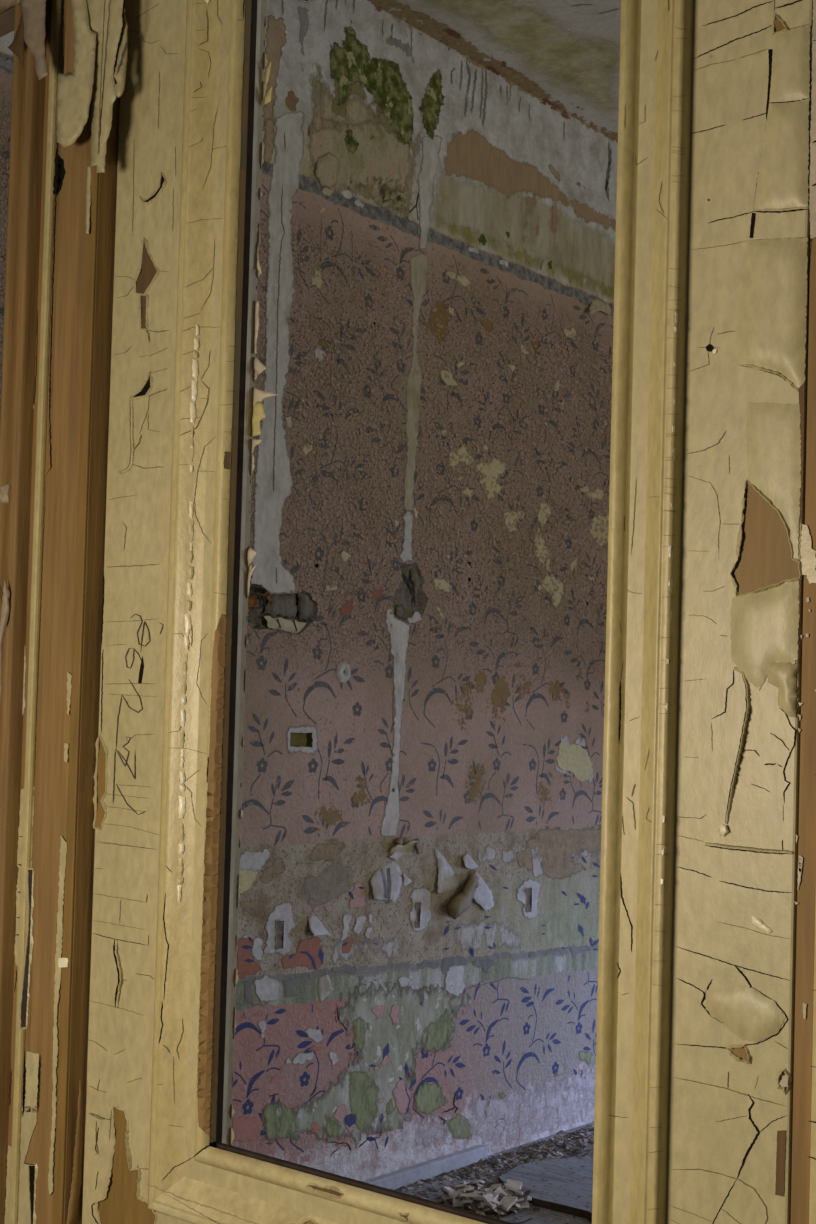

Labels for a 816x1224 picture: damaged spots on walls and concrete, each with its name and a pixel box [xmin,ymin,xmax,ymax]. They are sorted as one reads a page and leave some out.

peeling [0,0,128,234]
damp [282,0,618,297]
crack [101,0,245,730]
peeling [197,15,356,1145]
crack [624,0,811,636]
peeling [730,383,816,619]
peeling [14,787,35,1030]
peeling [4,835,69,1224]
crack [132,727,209,826]
flaking render [261,965,472,1150]
crack [608,873,816,1224]
crack [619,636,816,893]